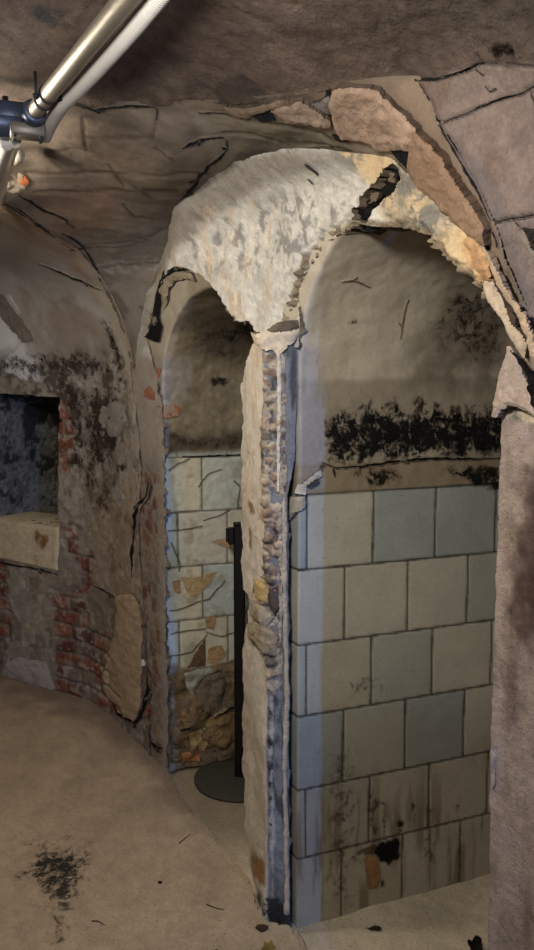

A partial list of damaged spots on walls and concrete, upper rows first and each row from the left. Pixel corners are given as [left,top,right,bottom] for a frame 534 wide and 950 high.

crack [75,102,160,120]
crack [6,193,102,290]
crack [144,268,197,342]
crack [180,135,229,202]
crack [341,276,371,289]
flaking render [198,81,534,418]
crack [358,169,400,233]
crack [414,62,534,248]
damp [1,353,118,519]
crack [129,453,241,577]
crack [169,580,234,657]
crack [112,672,163,753]